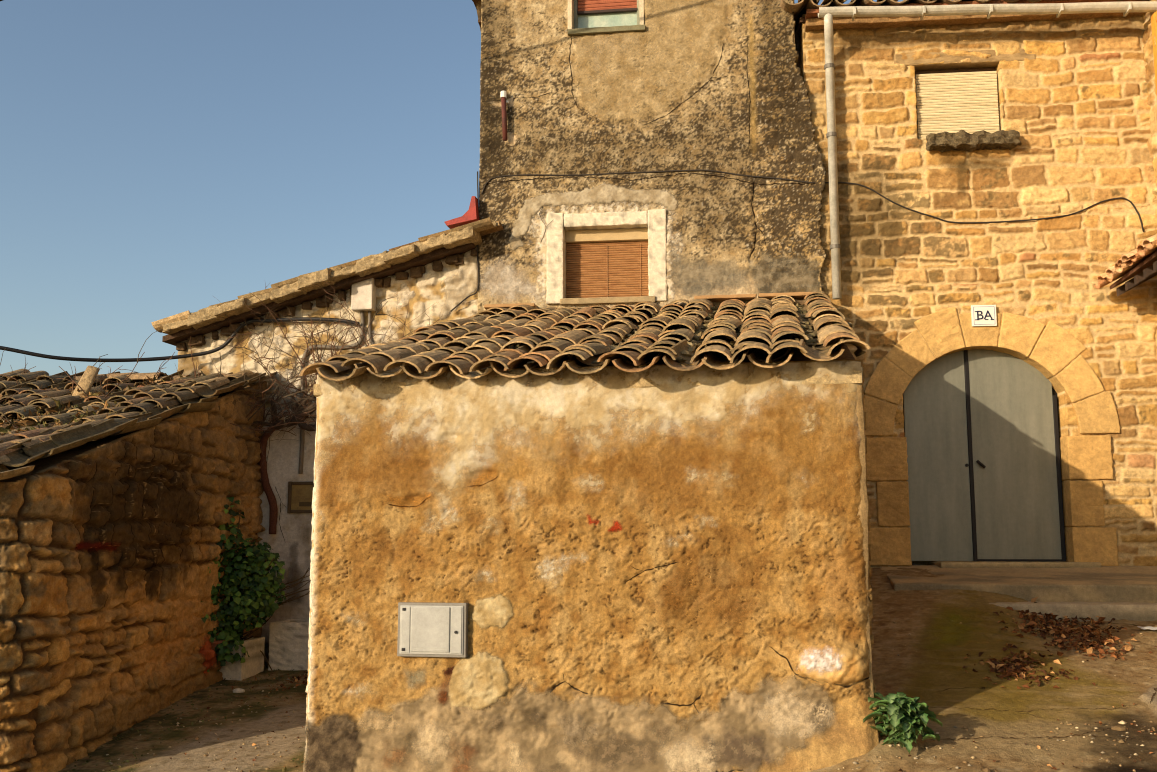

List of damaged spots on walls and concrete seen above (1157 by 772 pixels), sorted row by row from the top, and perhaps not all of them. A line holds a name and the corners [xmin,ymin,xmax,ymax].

leakage [483,262,545,298]
leakage [675,255,823,301]
peeling [274,358,863,528]
leakage [303,713,361,772]
spalling [352,676,833,772]